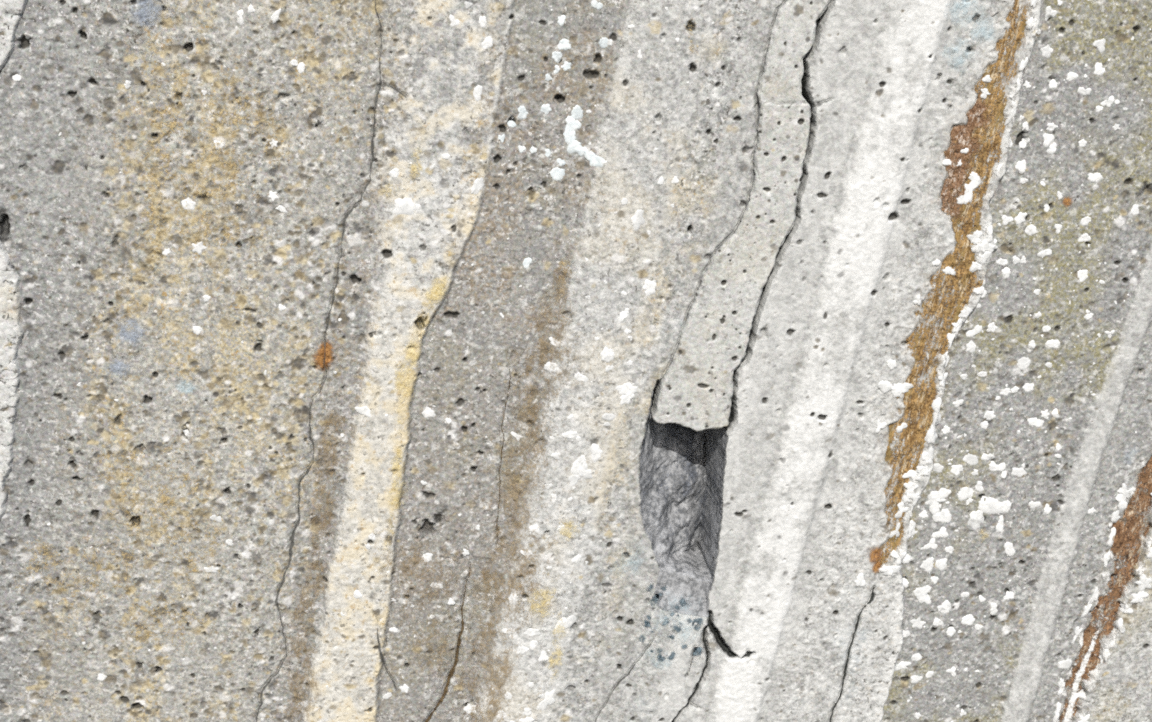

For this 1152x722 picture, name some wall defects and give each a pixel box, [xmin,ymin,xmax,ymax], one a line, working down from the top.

crack [801,65,830,141]
crack [743,286,765,359]
corrosion [870,0,1029,573]
crack [723,397,734,430]
spalling [639,379,728,617]
corrosion [1057,457,1152,722]
crack [595,638,655,722]
crack [672,610,753,722]
crack [830,587,875,722]